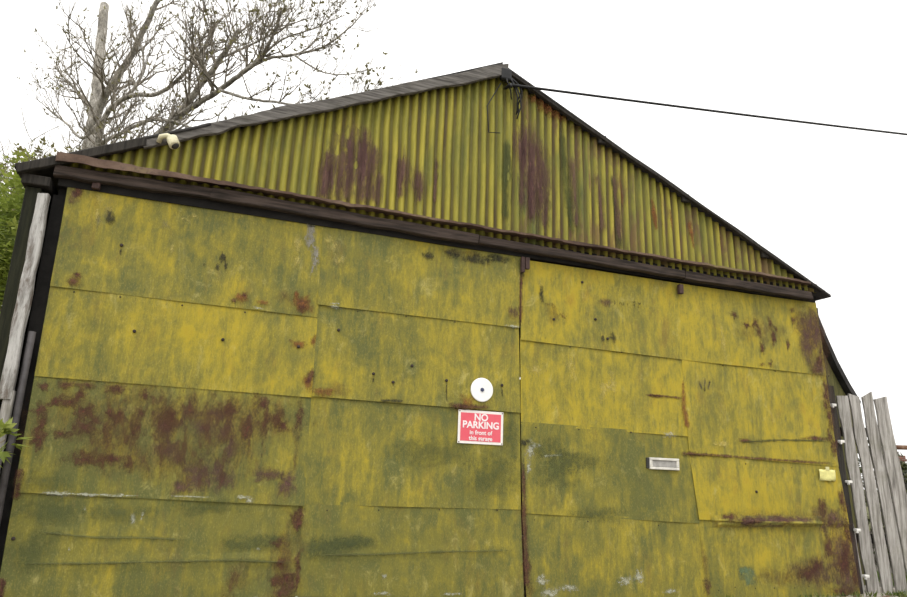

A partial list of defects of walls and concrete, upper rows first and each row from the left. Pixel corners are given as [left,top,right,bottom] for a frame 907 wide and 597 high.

corrosion [317,129,383,204]
corrosion [513,130,550,225]
corrosion [733,312,777,352]
corrosion [30,382,145,450]
corrosion [155,395,304,493]
corrosion [684,382,837,464]
corrosion [522,470,531,585]
corrosion [723,491,859,596]